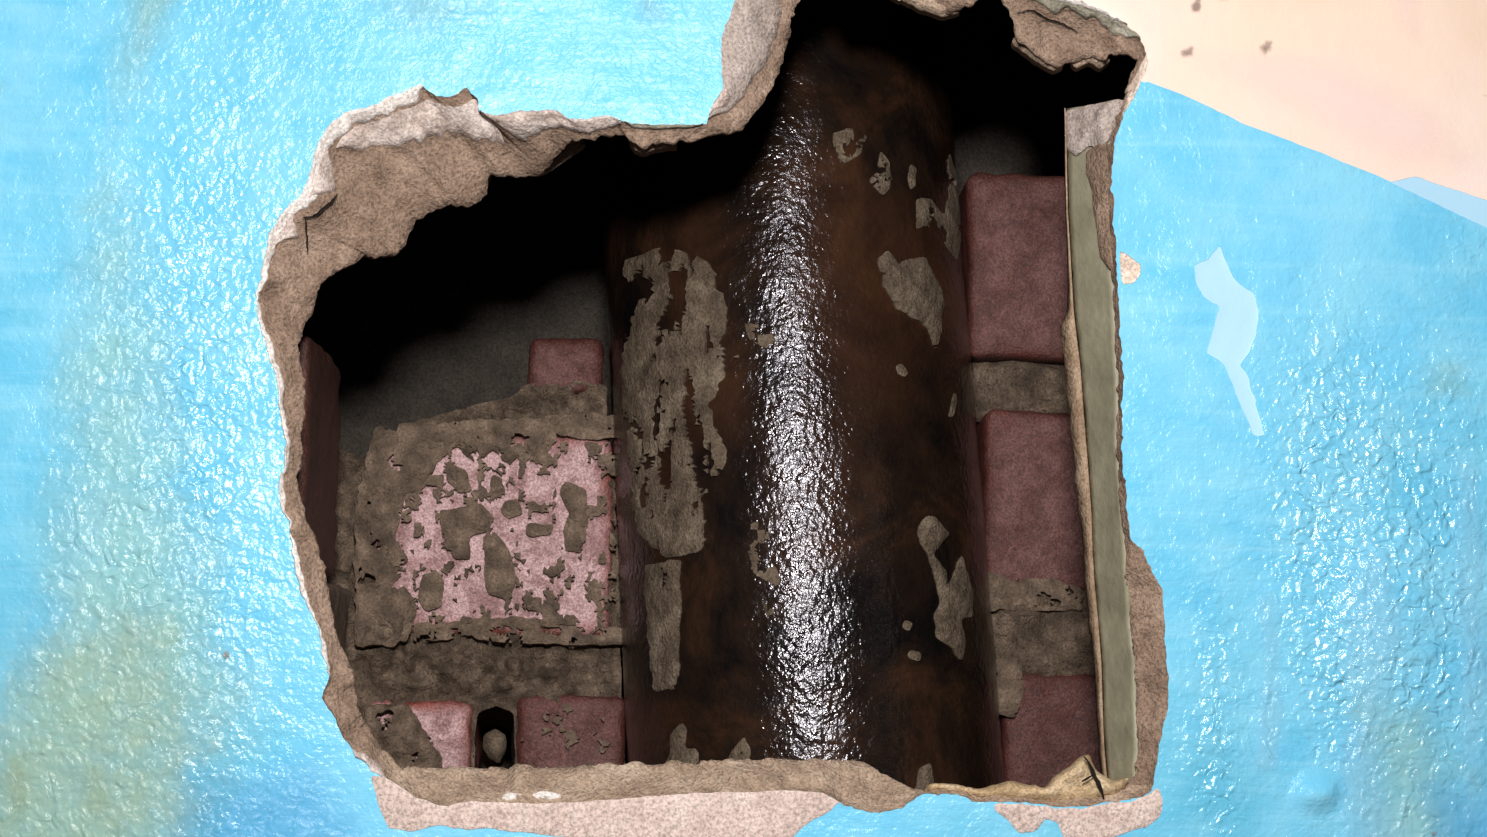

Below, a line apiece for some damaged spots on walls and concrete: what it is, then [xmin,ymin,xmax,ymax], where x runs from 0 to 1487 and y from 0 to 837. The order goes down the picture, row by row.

flaking render [255,0,1169,837]
peeling [1194,246,1264,436]